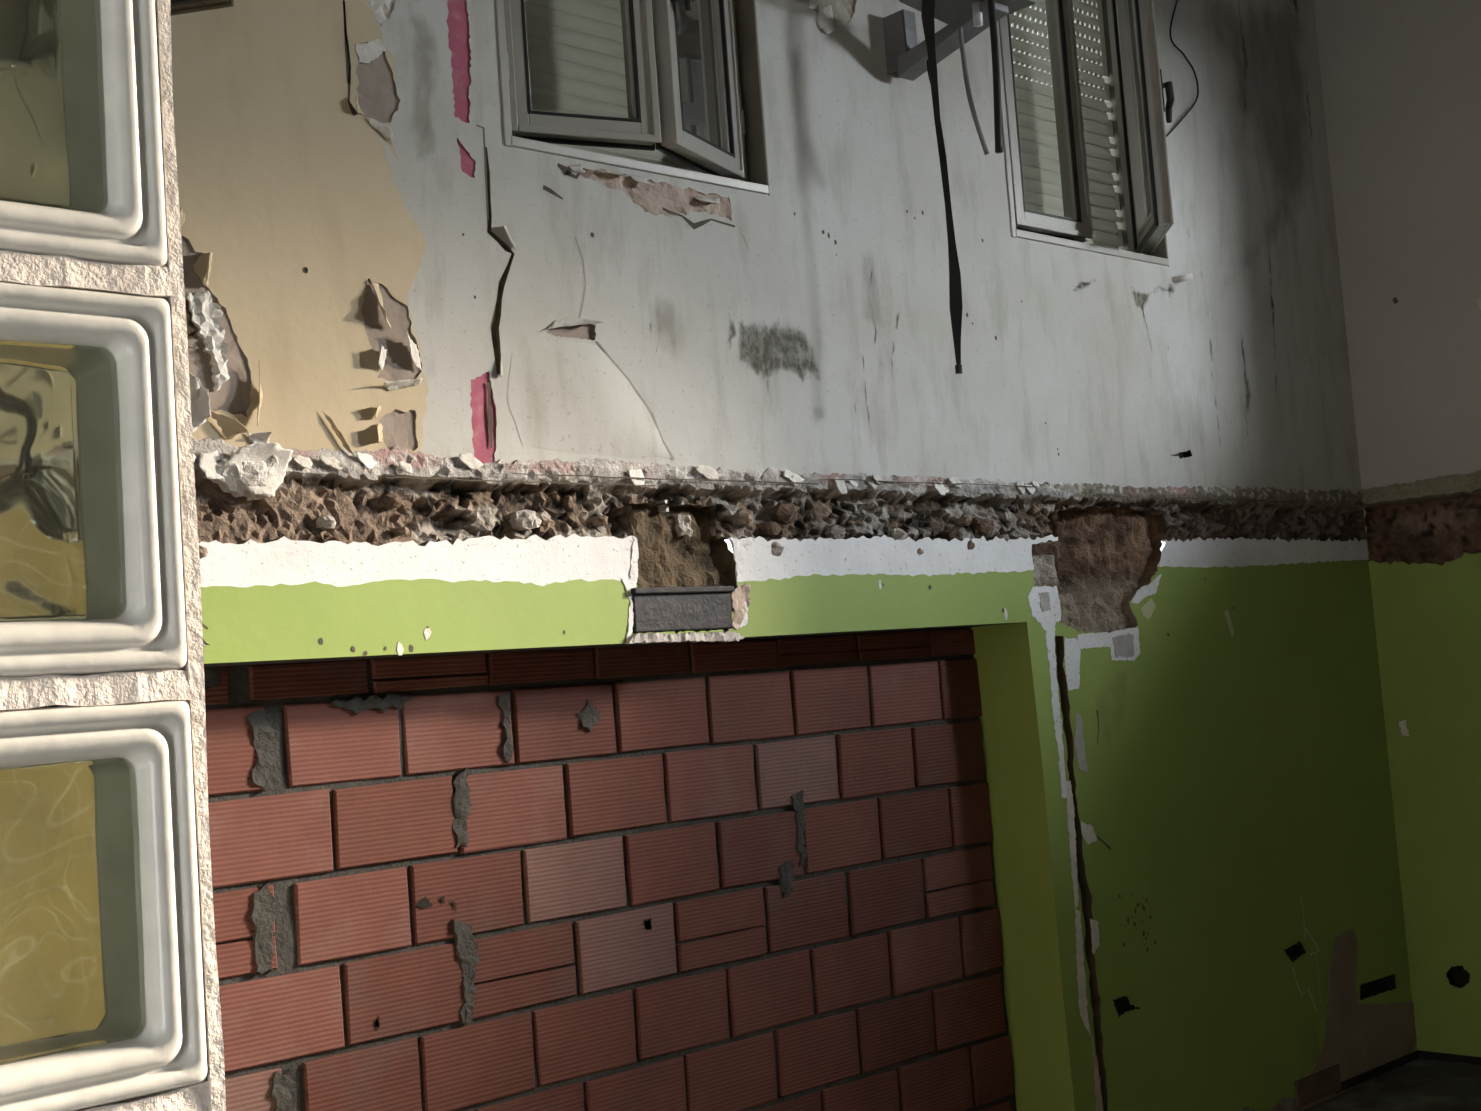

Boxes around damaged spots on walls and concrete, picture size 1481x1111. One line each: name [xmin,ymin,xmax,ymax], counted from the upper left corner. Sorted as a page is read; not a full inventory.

peeling [343,0,400,143]
peeling [446,0,476,178]
flaking render [809,0,857,34]
flaking render [557,163,735,229]
damp [730,324,818,378]
spalling [180,205,1481,566]
crack [1045,632,1111,1111]
spalling [1284,897,1321,1010]